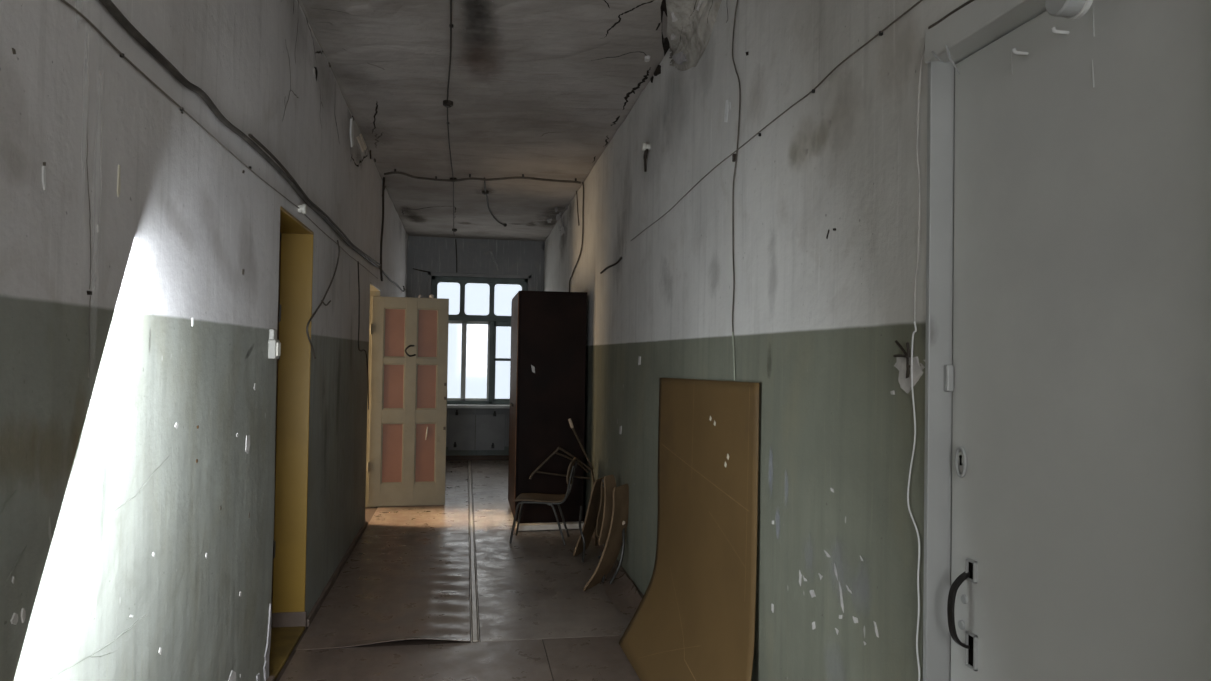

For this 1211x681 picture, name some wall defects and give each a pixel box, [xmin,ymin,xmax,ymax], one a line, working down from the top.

crack [591,0,728,163]
spalling [891,340,925,395]
spalling [256,604,271,681]